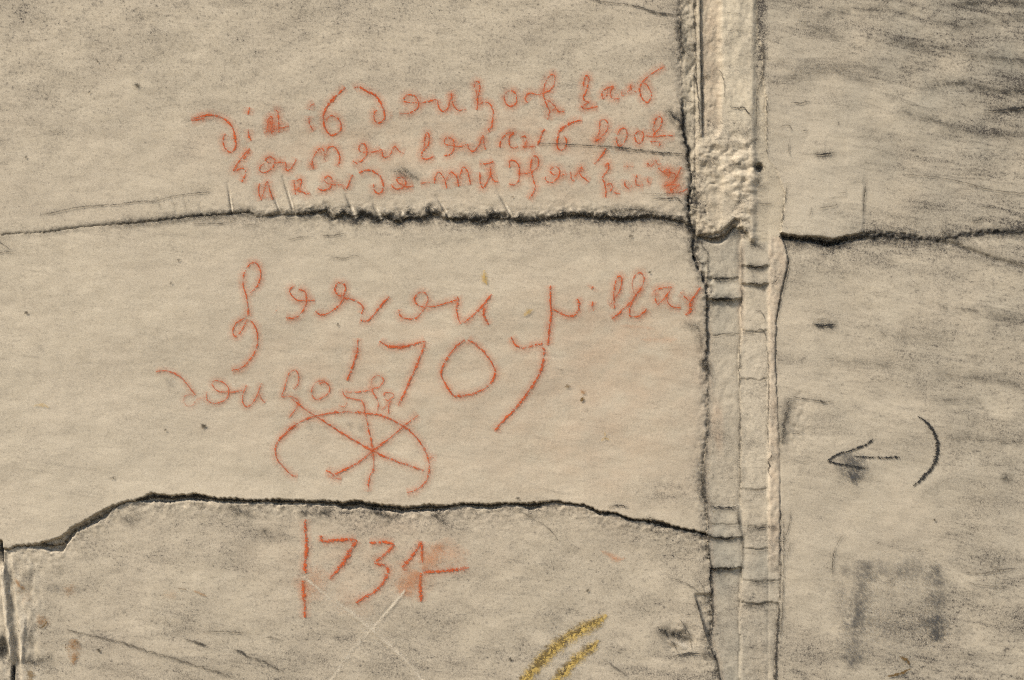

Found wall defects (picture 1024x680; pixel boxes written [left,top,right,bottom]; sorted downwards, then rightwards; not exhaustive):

crack [43,174,1024,680]